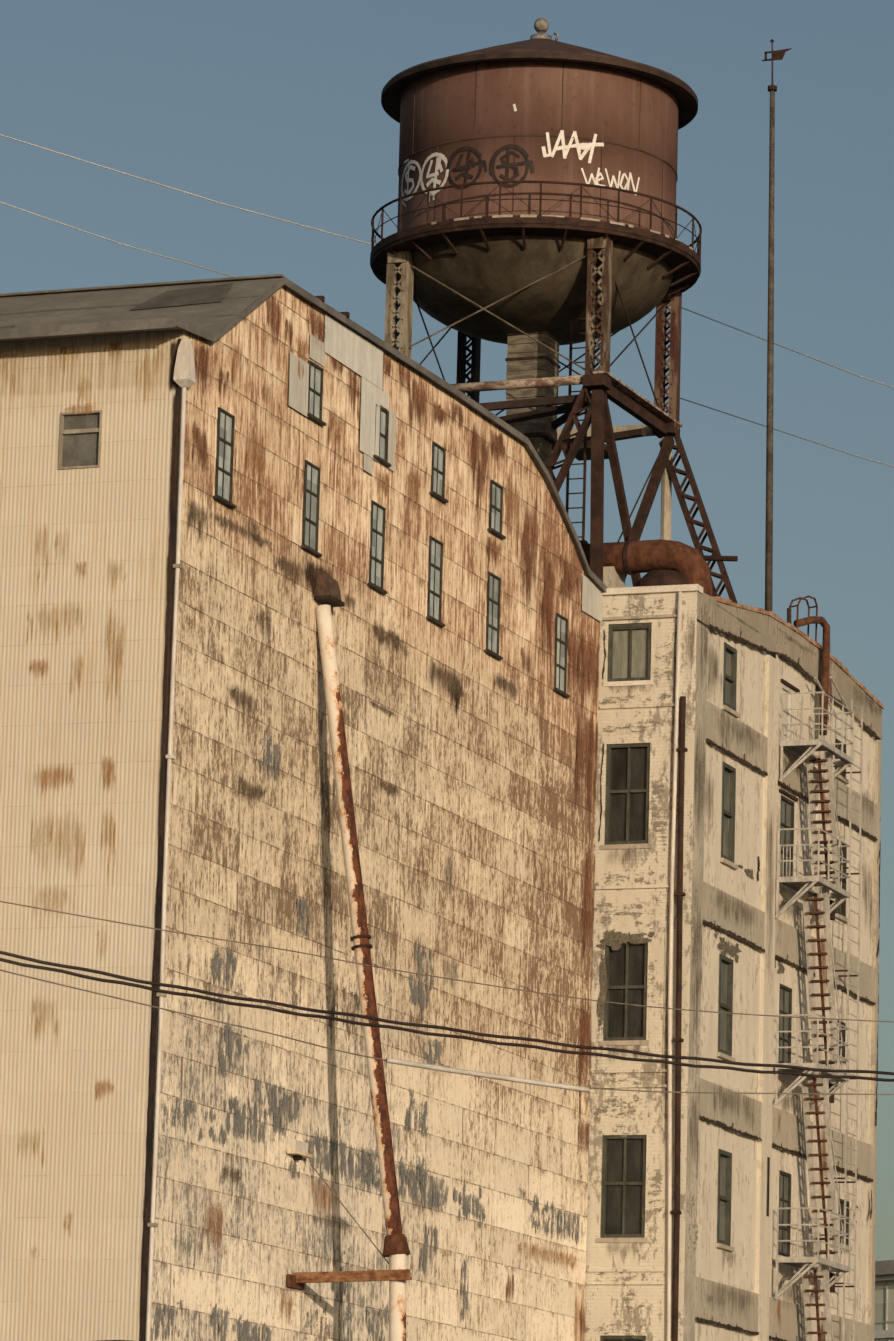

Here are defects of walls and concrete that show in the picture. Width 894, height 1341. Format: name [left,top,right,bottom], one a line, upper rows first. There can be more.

corrosion [268,297,324,378]
corrosion [383,355,505,507]
corrosion [505,477,578,681]
damp [373,625,408,655]
damp [232,687,257,712]
damp [430,665,463,717]
damp [494,676,516,696]
corrosion [567,634,599,827]
peeling [598,632,677,742]
flaking render [594,869,658,1047]
peeling [590,1072,655,1137]
flaking render [586,1272,665,1338]